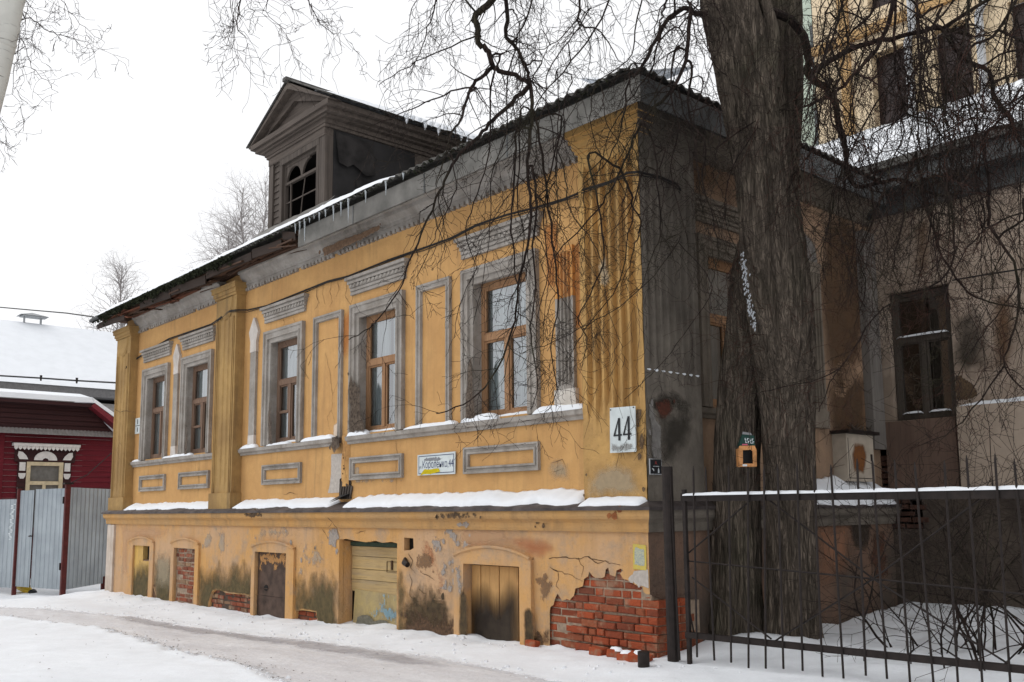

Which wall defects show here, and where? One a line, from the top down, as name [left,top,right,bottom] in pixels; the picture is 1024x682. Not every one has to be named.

water stain [649,396,689,460]
peeling [255,529,321,573]
peeling [416,512,481,600]
crack [549,556,619,591]
flaking render [211,590,250,613]
water stain [296,577,336,624]
flaking render [534,568,703,658]